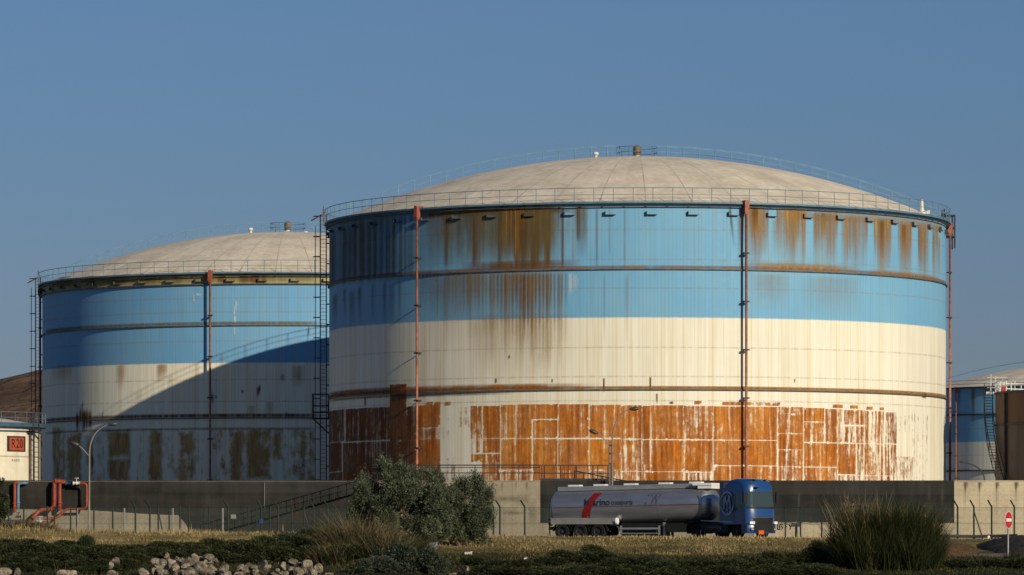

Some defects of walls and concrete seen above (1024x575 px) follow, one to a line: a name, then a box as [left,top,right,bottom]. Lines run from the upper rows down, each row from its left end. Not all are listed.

corrosion [730,208,762,238]
corrosion [777,209,857,242]
corrosion [871,217,925,254]
corrosion [329,207,588,315]
corrosion [759,264,945,283]
corrosion [329,377,946,480]